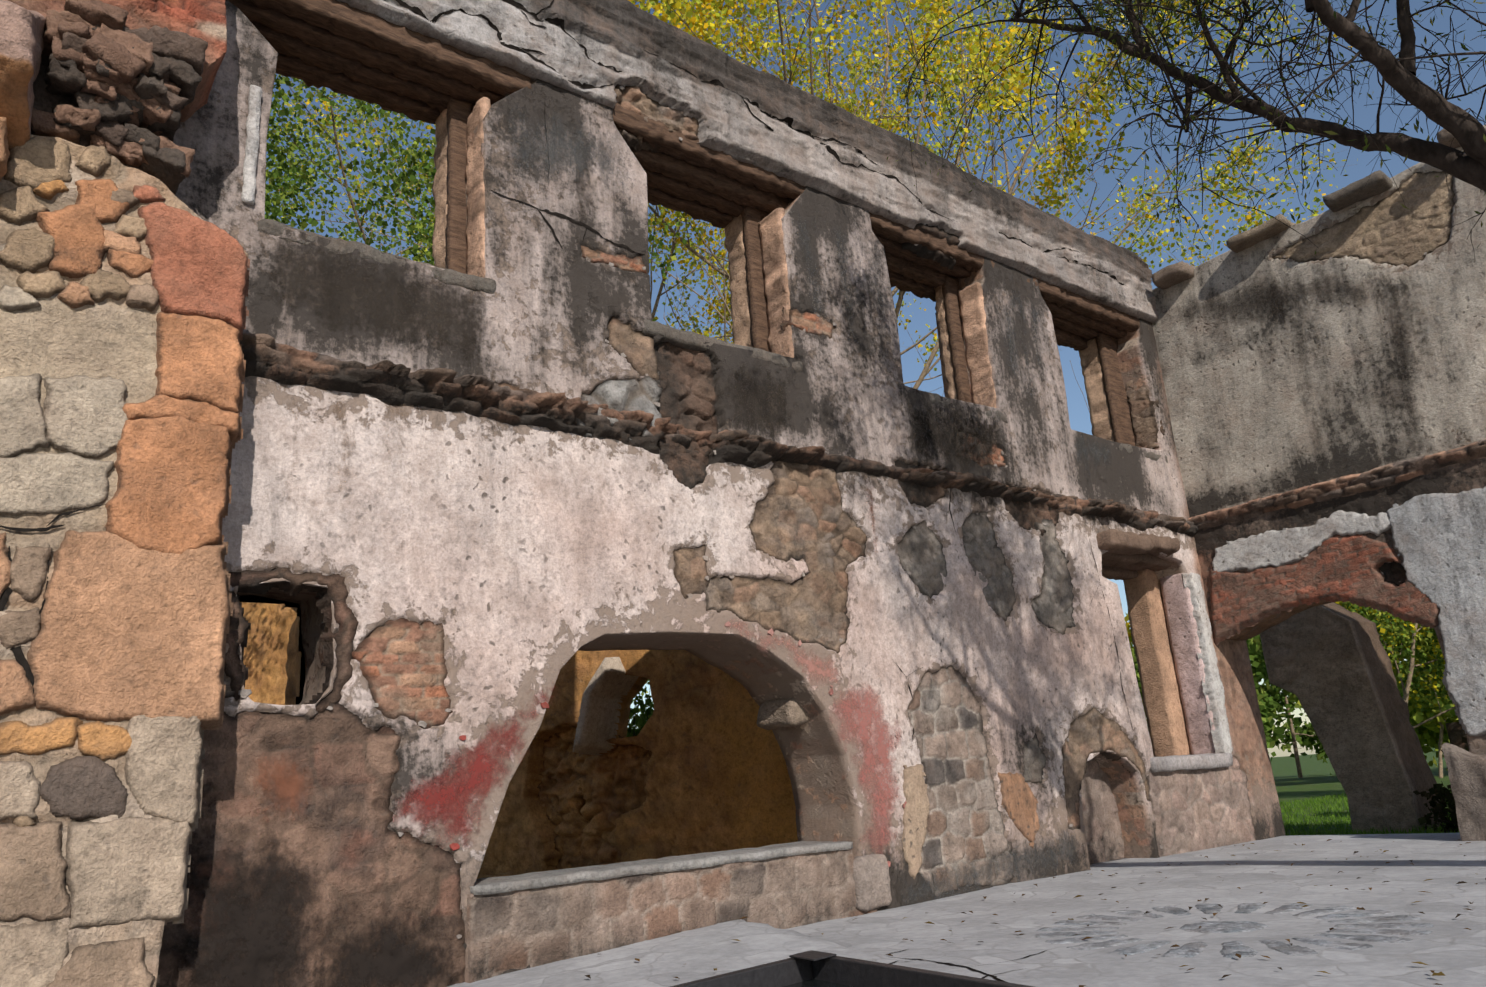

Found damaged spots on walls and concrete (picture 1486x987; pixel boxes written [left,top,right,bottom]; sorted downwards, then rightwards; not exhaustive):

water stain [515,115,612,219]
crack [491,109,645,255]
crack [396,0,958,222]
crack [999,232,1124,285]
water stain [1184,277,1364,320]
water stain [1381,281,1415,433]
spalling [962,487,1075,635]
spalling [673,460,1040,897]
peeling [1061,487,1486,857]
spalling [156,567,521,987]
spalling [537,726,652,870]
water stain [319,915,458,987]